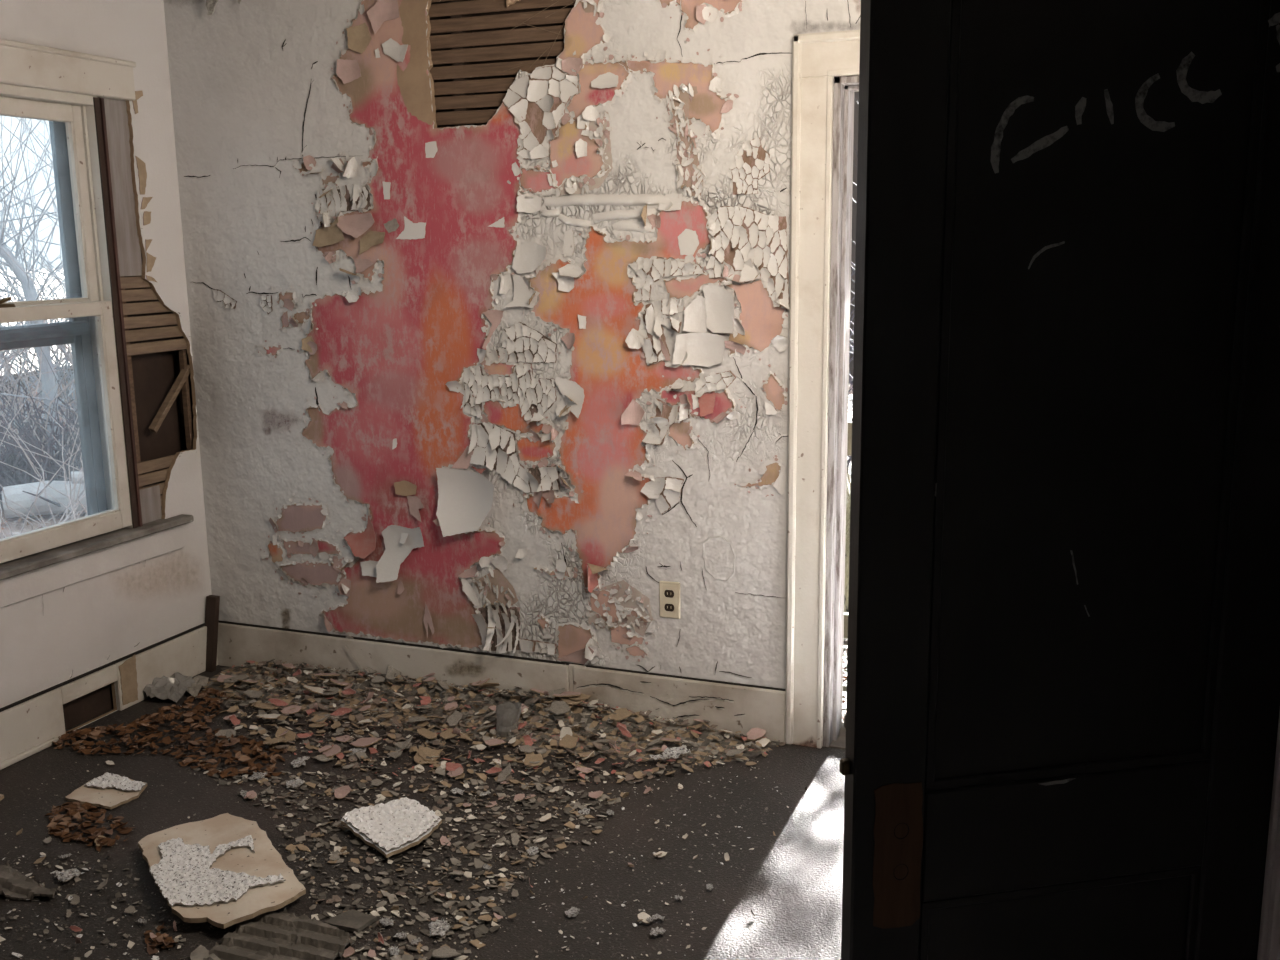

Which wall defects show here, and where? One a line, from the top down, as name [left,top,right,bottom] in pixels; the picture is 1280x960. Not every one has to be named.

spalling [132,91,143,114]
crack [184,61,371,314]
crack [502,0,861,365]
spalling [120,156,198,507]
peeling [252,0,790,665]
crack [649,357,788,528]
crack [560,543,786,720]